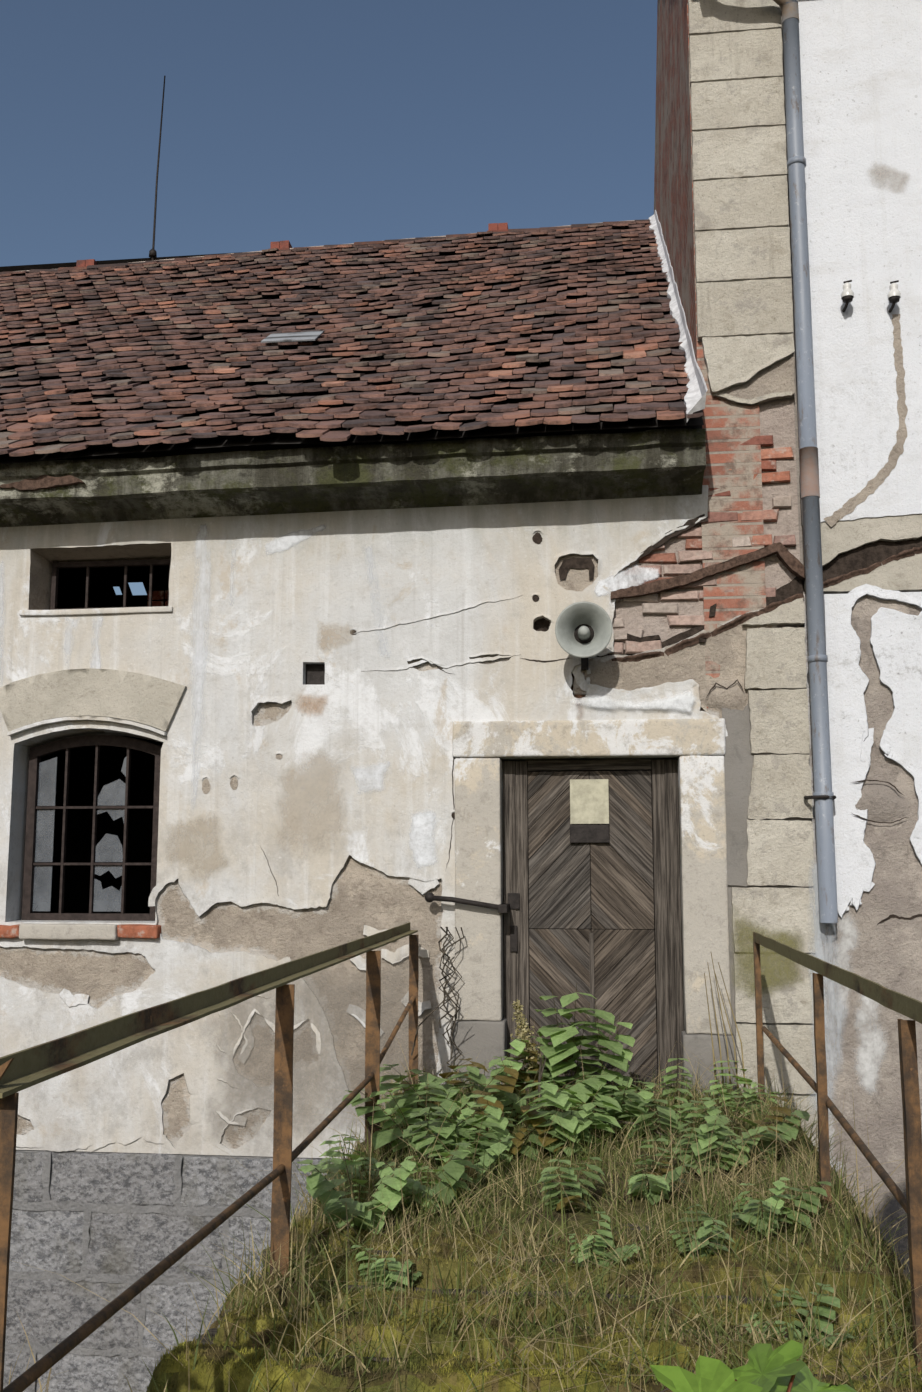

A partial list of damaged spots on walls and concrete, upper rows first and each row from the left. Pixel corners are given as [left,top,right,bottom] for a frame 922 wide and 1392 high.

spalling [531,528,544,544]
crack [618,514,709,574]
spalling [530,592,554,632]
crack [347,537,922,674]
flaking render [549,350,817,869]
peeling [244,694,299,726]
crack [706,679,744,698]
peeling [817,584,922,1222]
peeling [0,846,452,1116]
peeling [16,991,275,1152]
damp [876,1188,910,1278]